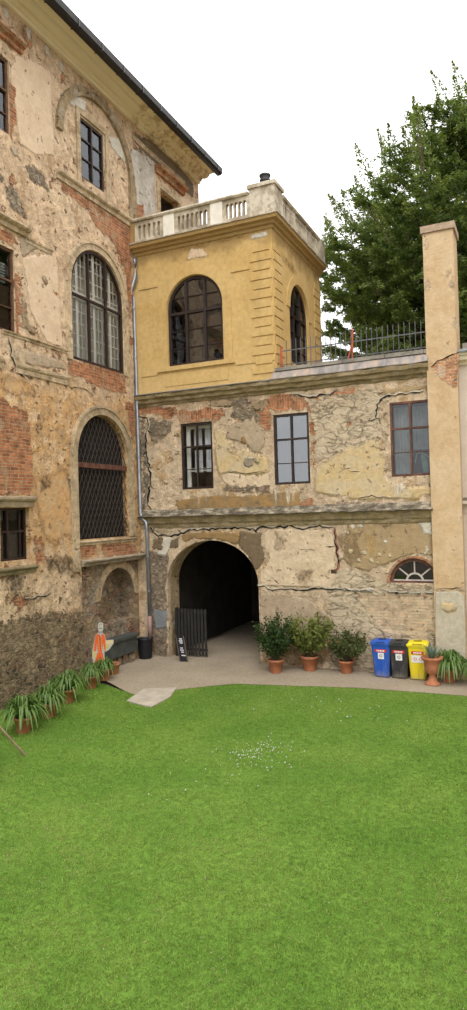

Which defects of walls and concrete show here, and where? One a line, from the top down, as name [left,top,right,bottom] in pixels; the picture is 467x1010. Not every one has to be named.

flaking render [0,173,27,218]
peeling [9,54,132,318]
peeling [130,132,199,219]
peeling [0,228,63,348]
crack [369,352,457,421]
flaking render [431,354,460,388]
flaking render [0,397,72,564]
crack [139,416,374,593]
flaking render [176,387,431,509]
flaking render [0,611,86,711]